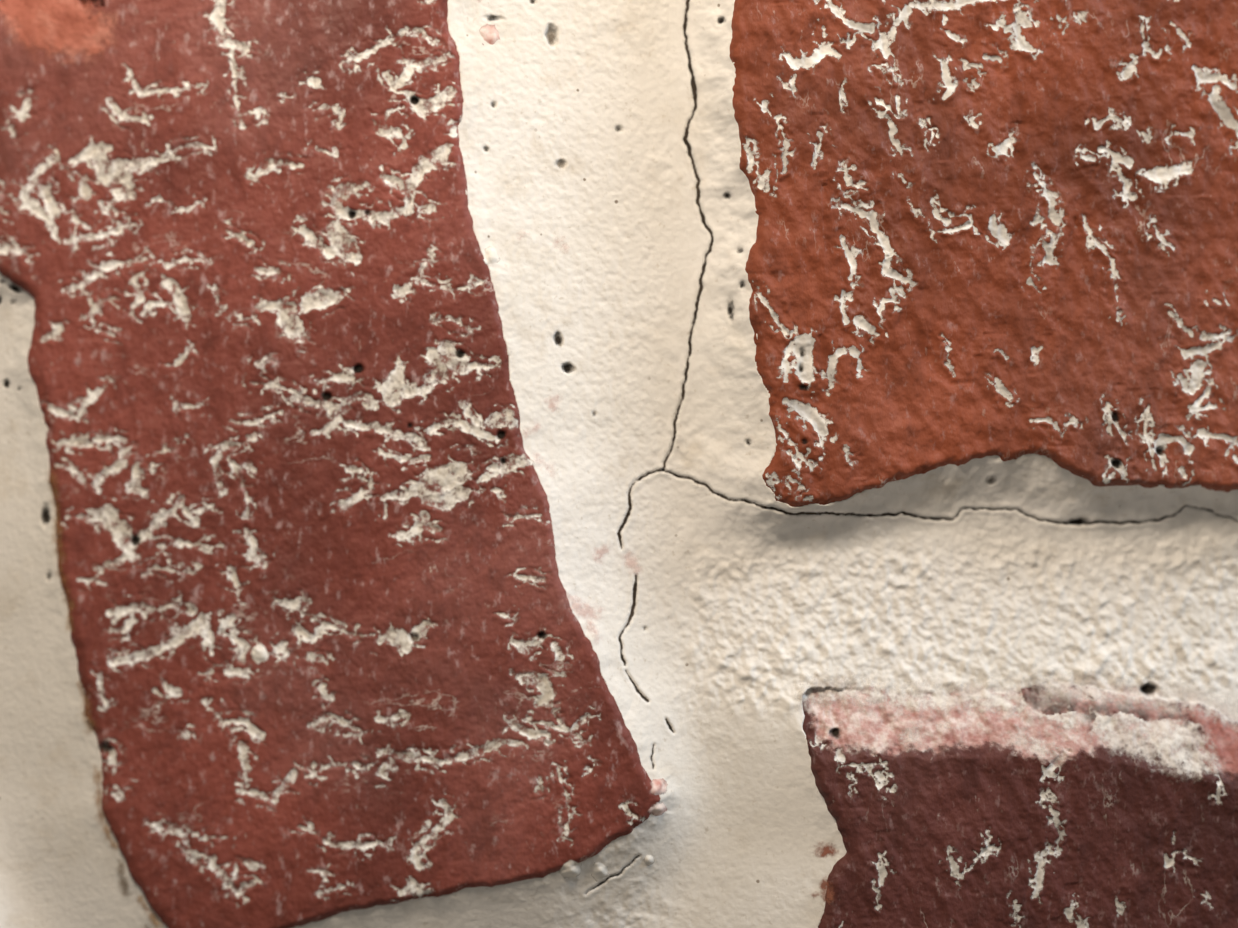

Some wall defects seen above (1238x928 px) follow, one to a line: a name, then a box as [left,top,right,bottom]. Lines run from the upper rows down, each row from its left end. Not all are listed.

crack [617,0,1237,548]
crack [619,575,674,768]